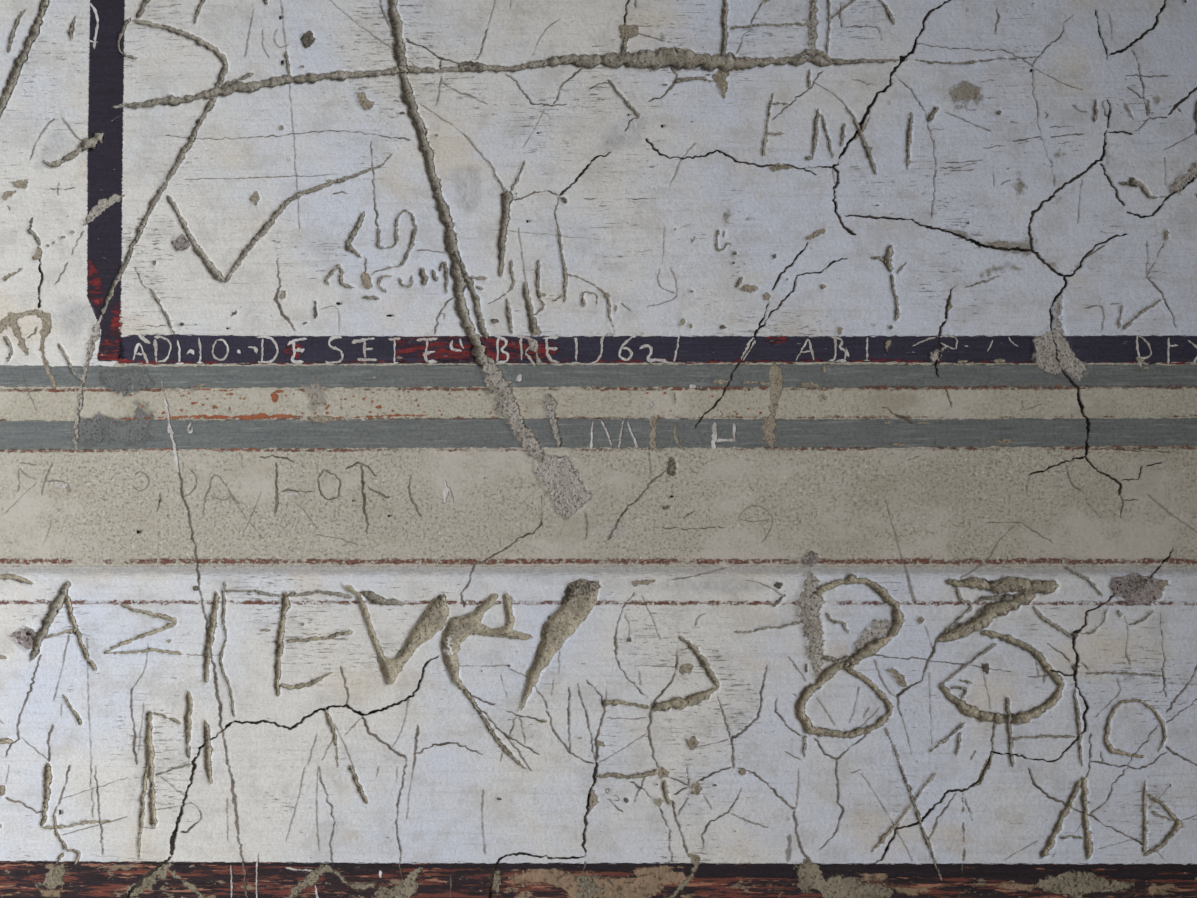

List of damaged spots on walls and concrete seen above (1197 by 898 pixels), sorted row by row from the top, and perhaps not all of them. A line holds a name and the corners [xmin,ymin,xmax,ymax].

crack [506,0,1197,496]
crack [460,497,542,607]
crack [126,655,482,898]
crack [488,651,678,898]
crack [874,548,1197,864]